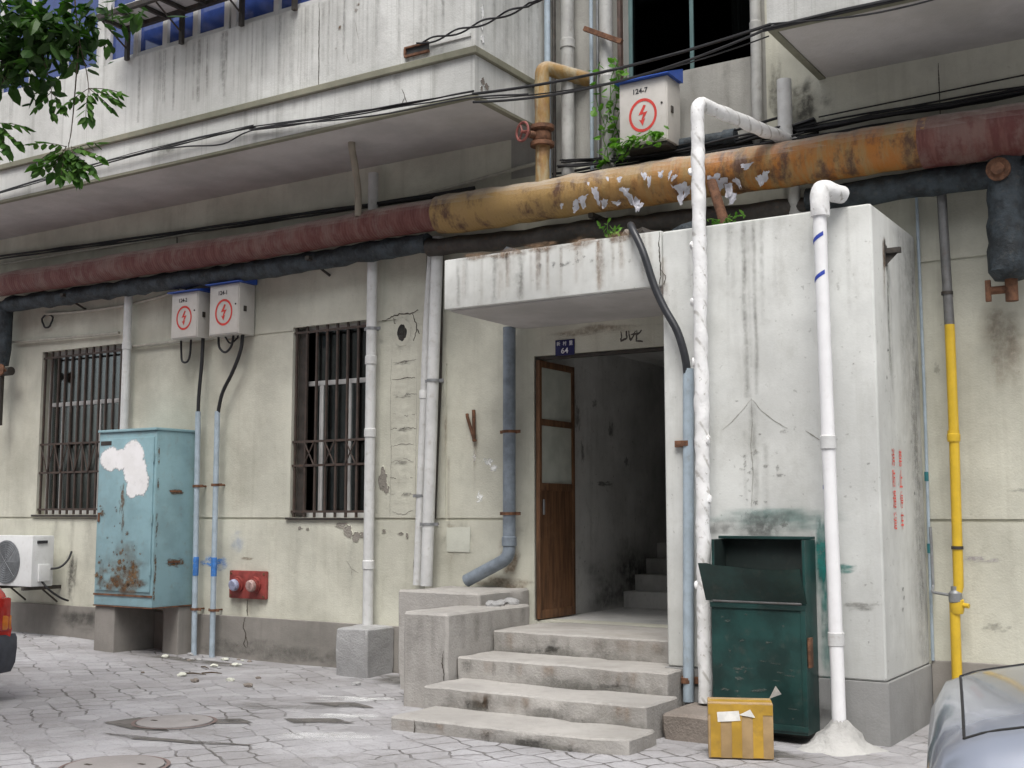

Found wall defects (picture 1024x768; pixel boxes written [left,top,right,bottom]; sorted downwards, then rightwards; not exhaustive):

crack [382,310,420,517]
spalling [378,465,390,495]
spalling [335,522,364,543]